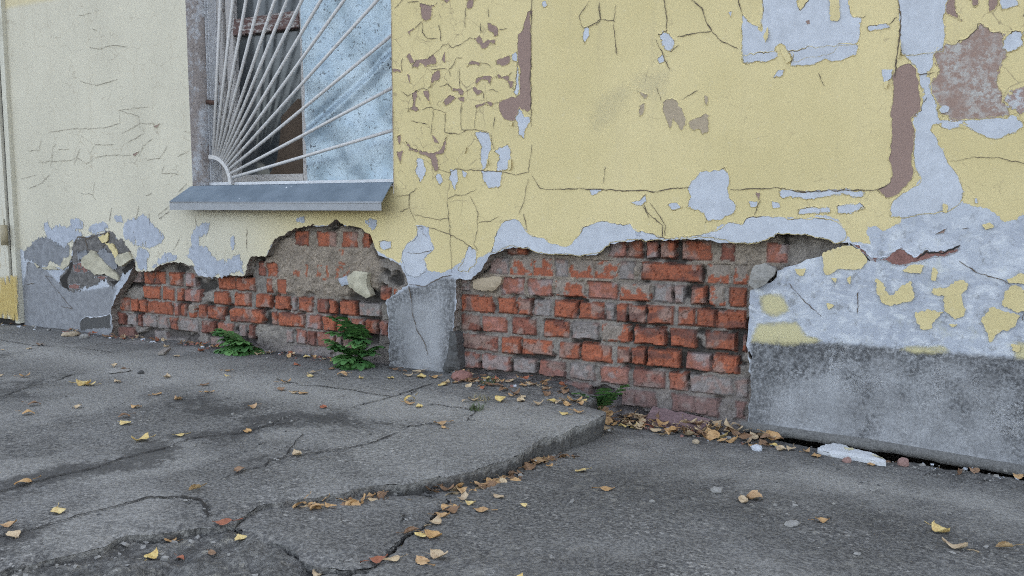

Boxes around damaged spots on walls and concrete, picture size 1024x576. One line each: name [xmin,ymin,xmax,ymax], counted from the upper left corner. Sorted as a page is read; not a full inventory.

crack [22,107,186,215]
crack [392,0,691,356]
flaking render [443,0,1024,434]
crack [731,184,886,192]
peeling [0,276,33,321]
flaking render [24,206,434,364]
crack [0,379,476,491]
crack [0,495,213,536]